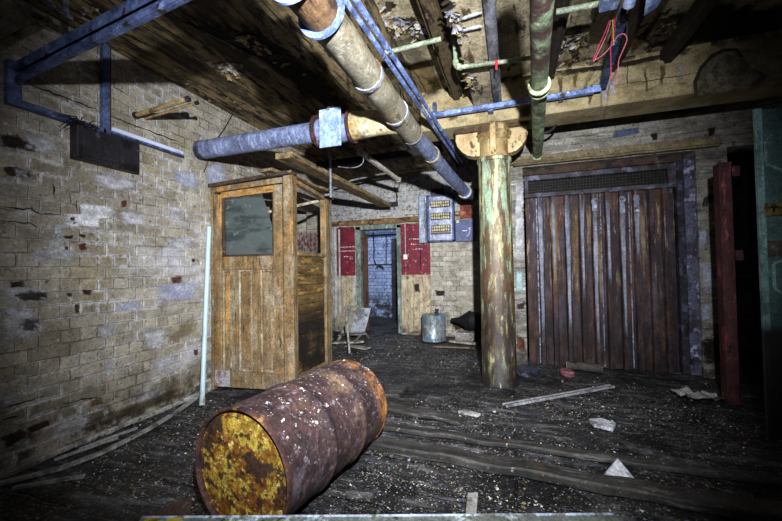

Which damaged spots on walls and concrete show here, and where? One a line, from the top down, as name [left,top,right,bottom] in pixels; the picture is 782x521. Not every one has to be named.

crack [0,184,78,230]
peeling [515,180,524,256]
peeling [2,281,50,344]
damp [91,391,174,429]